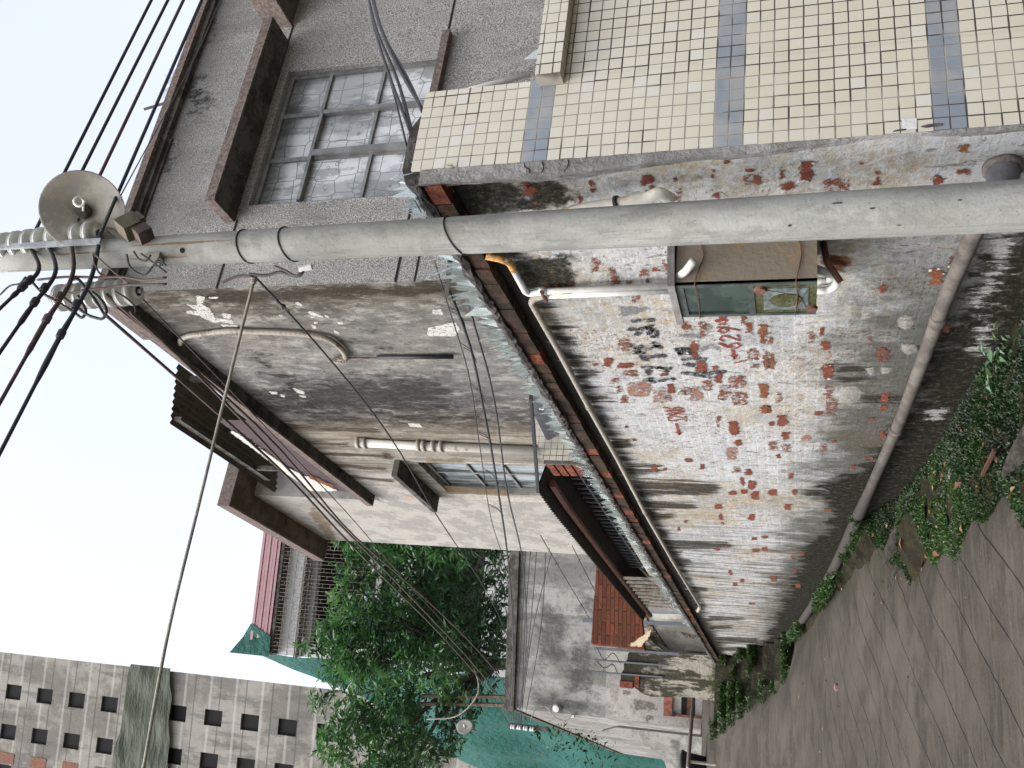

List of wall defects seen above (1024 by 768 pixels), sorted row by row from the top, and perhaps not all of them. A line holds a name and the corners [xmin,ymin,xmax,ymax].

water stain [465,181,577,214]
spalling [640,172,655,192]
spalling [780,161,851,204]
spalling [930,168,971,185]
corrosion [485,253,517,273]
spalling [588,257,667,285]
peeling [185,295,238,327]
water stain [209,280,497,327]
spalling [593,316,838,458]
water stain [708,232,1024,651]
spalling [714,416,798,525]
water stain [626,463,731,567]